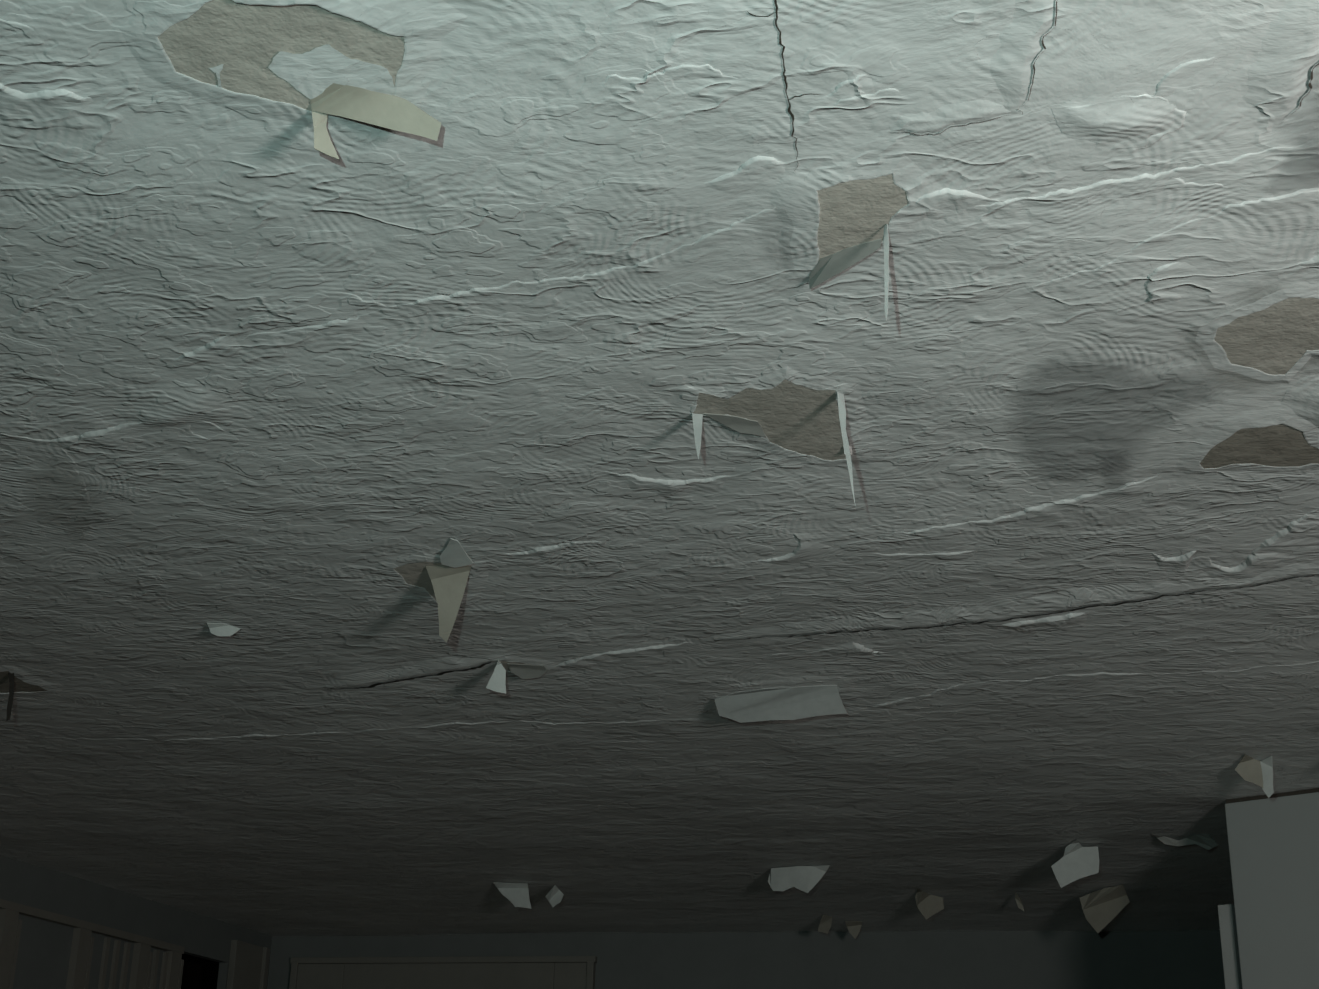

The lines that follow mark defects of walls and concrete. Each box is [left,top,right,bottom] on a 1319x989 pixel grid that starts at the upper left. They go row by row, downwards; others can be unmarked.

peeling [120,0,469,160]
crack [175,0,1057,367]
peeling [770,153,943,321]
peeling [1185,281,1319,384]
peeling [669,366,873,508]
peeling [1176,403,1319,475]
peeling [373,538,491,642]
peeling [484,655,563,694]
peeling [699,676,856,723]
peeling [493,882,532,909]
peeling [768,865,830,893]
peeling [1051,840,1130,933]